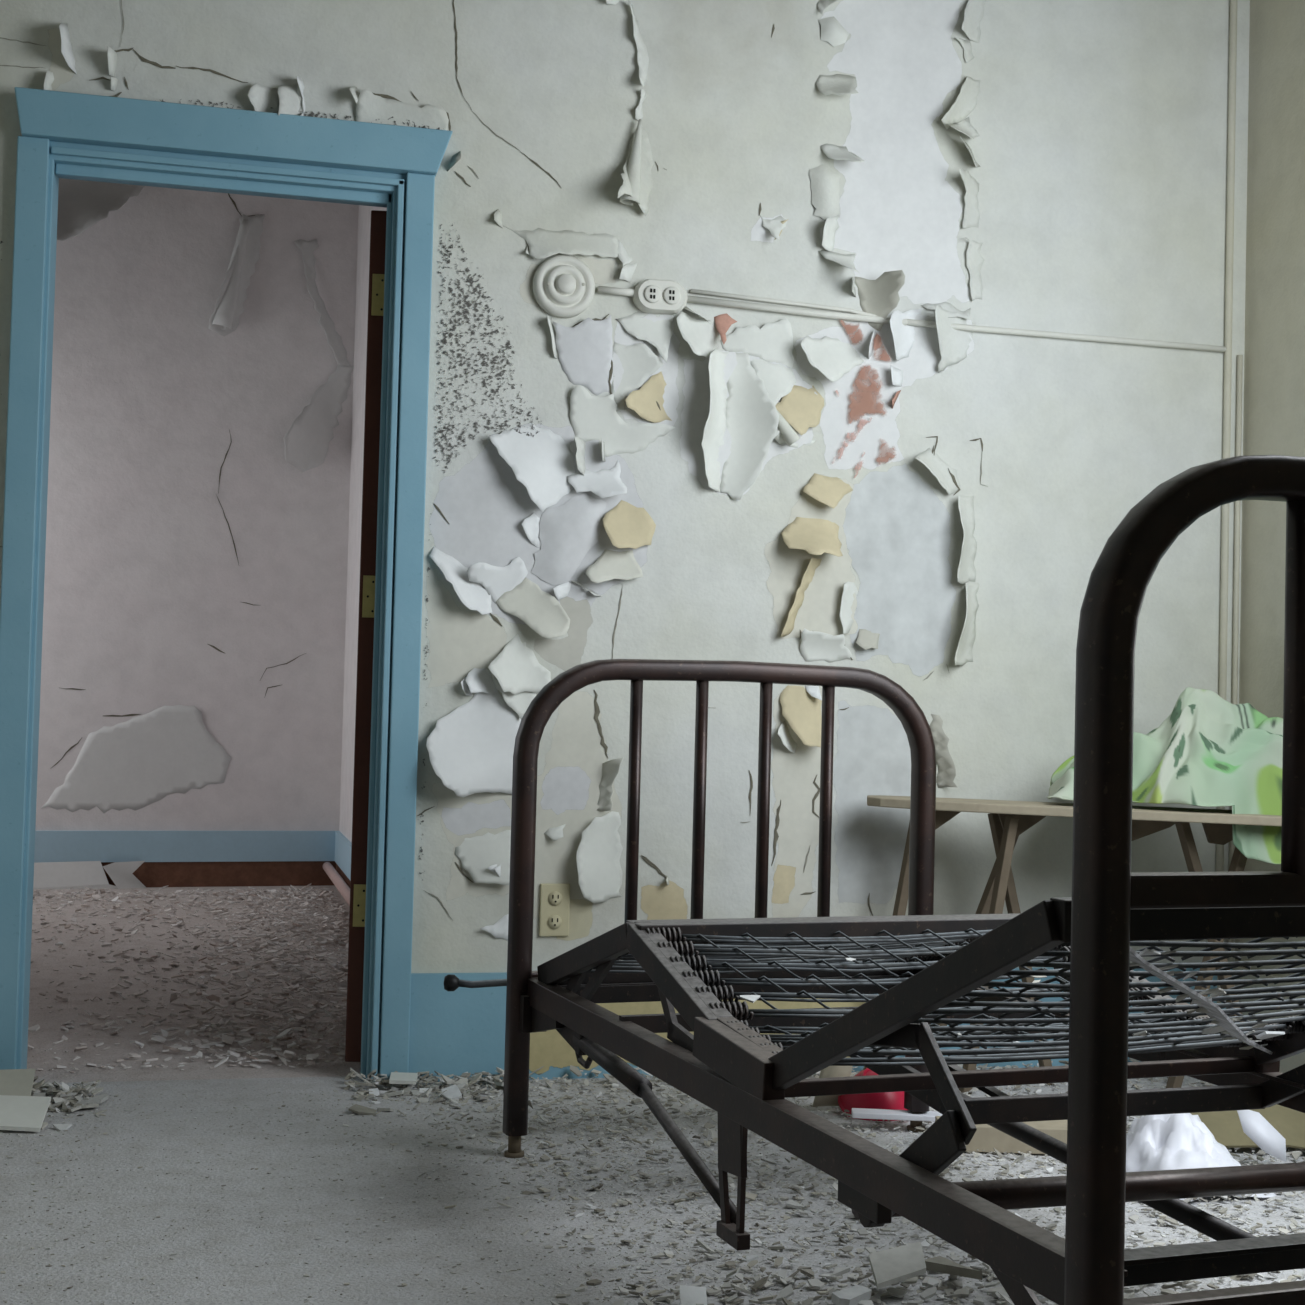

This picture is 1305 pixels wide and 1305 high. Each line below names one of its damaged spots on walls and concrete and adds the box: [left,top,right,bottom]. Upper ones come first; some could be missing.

crack [0,37,45,68]
peeling [43,23,305,116]
peeling [349,87,451,131]
crack [453,0,561,187]
water stain [433,225,542,473]
corrosion [836,320,890,459]
peeling [417,0,987,941]
corrosion [854,443,895,478]